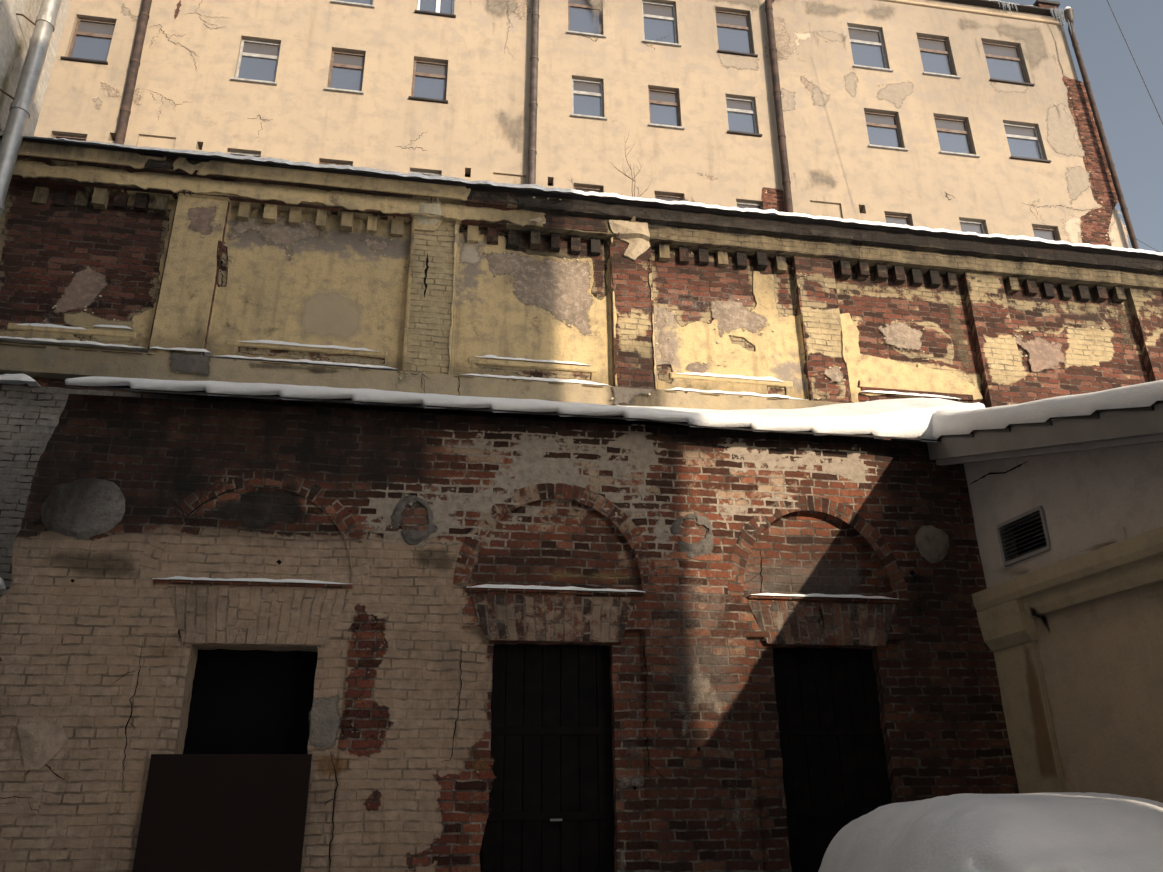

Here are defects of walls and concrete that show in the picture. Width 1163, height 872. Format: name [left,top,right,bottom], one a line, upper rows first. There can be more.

crack [148,2,225,70]
damp [486,0,526,16]
spalling [1046,76,1131,248]
spalling [0,152,169,343]
crack [422,253,430,297]
peeling [457,191,610,335]
spalling [611,243,830,406]
crack [971,461,1028,484]
crack [113,642,143,790]
spalling [338,603,391,758]
crack [442,648,462,762]
spalling [404,774,461,872]